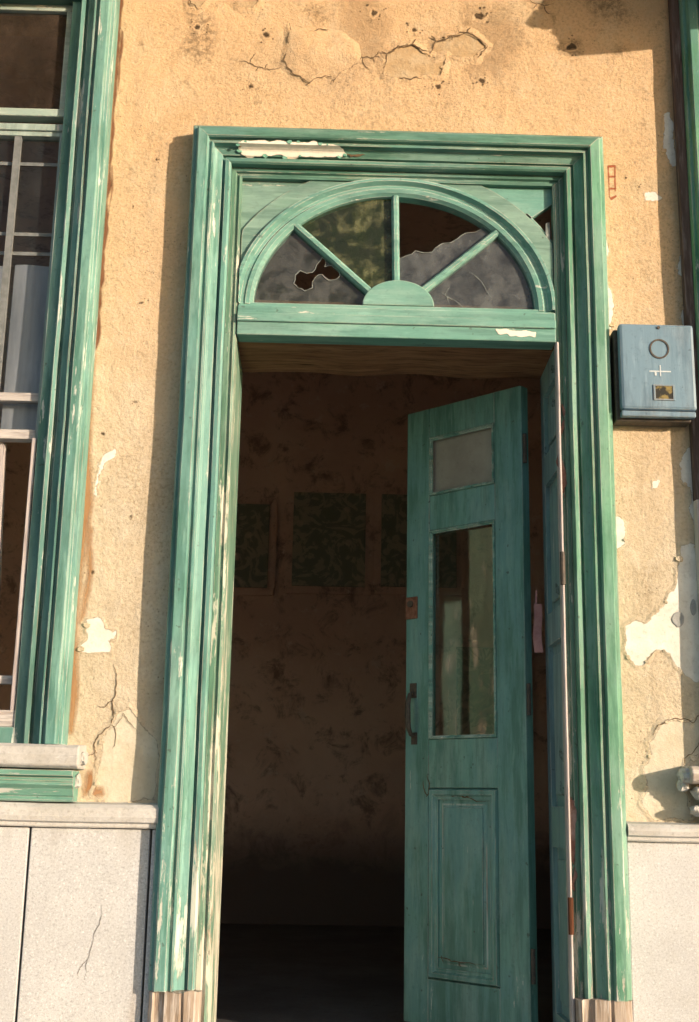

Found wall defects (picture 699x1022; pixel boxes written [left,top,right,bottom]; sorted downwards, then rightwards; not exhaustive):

spalling [181,0,265,34]
spalling [360,4,387,20]
spalling [376,7,493,95]
peeling [236,140,365,159]
flaking render [660,109,676,171]
flaking render [92,447,118,498]
flaking render [620,443,699,687]
flaking render [77,613,120,656]
crack [91,664,117,767]